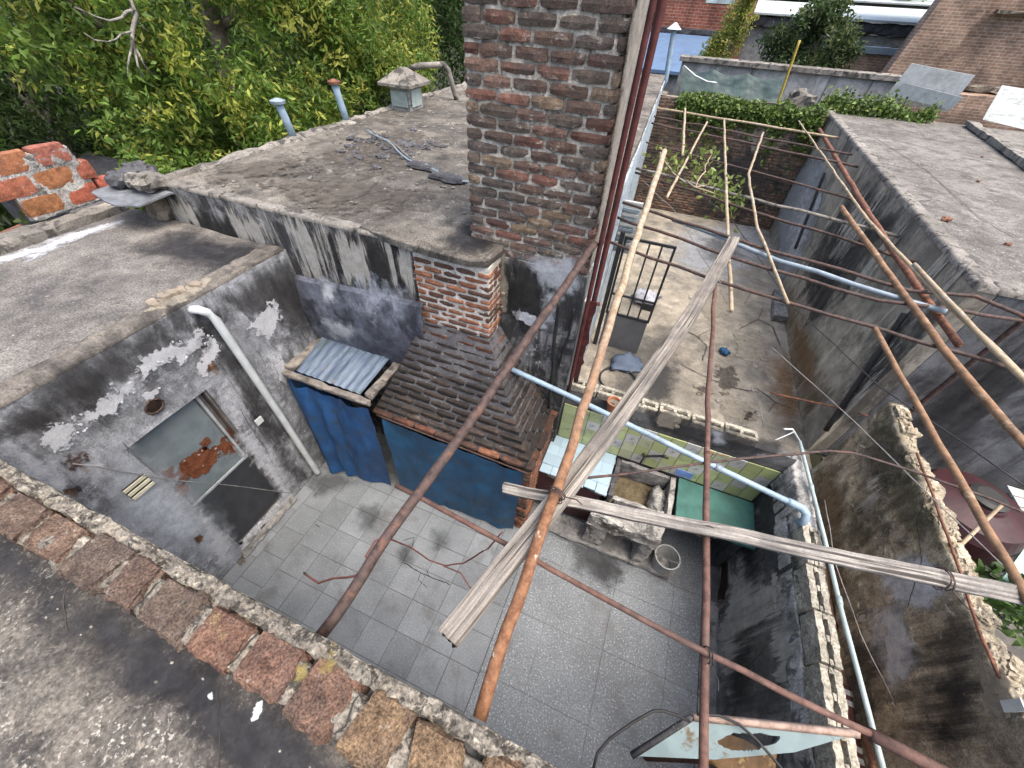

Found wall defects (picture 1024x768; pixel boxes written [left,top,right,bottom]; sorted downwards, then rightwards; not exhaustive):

damp [135,128,440,333]
peeling [247,299,283,343]
damp [501,258,577,331]
peeling [40,328,222,456]
rust [159,429,239,499]
damp [855,440,904,519]
damp [858,575,943,685]